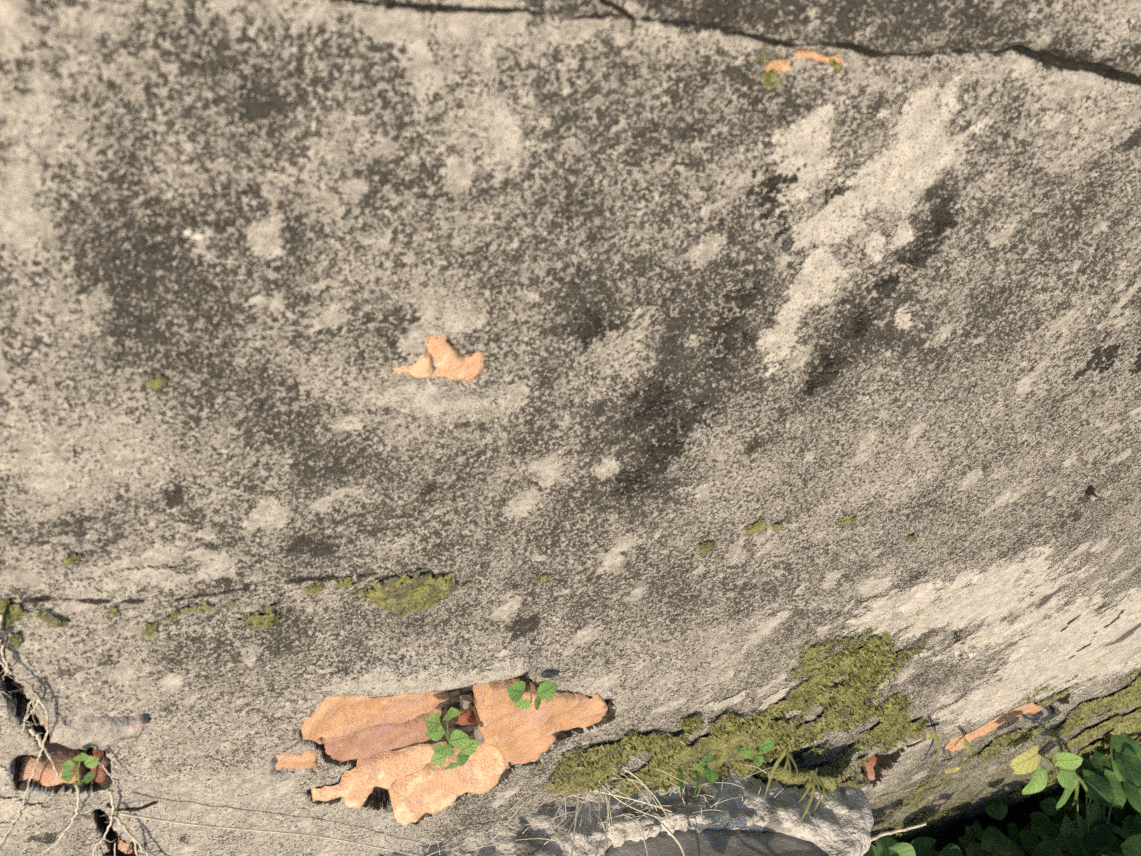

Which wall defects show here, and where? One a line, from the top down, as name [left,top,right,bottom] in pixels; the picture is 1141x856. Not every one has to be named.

crack [342,0,1141,86]
crack [2,596,144,605]
crack [174,573,376,602]
crack [0,636,45,741]